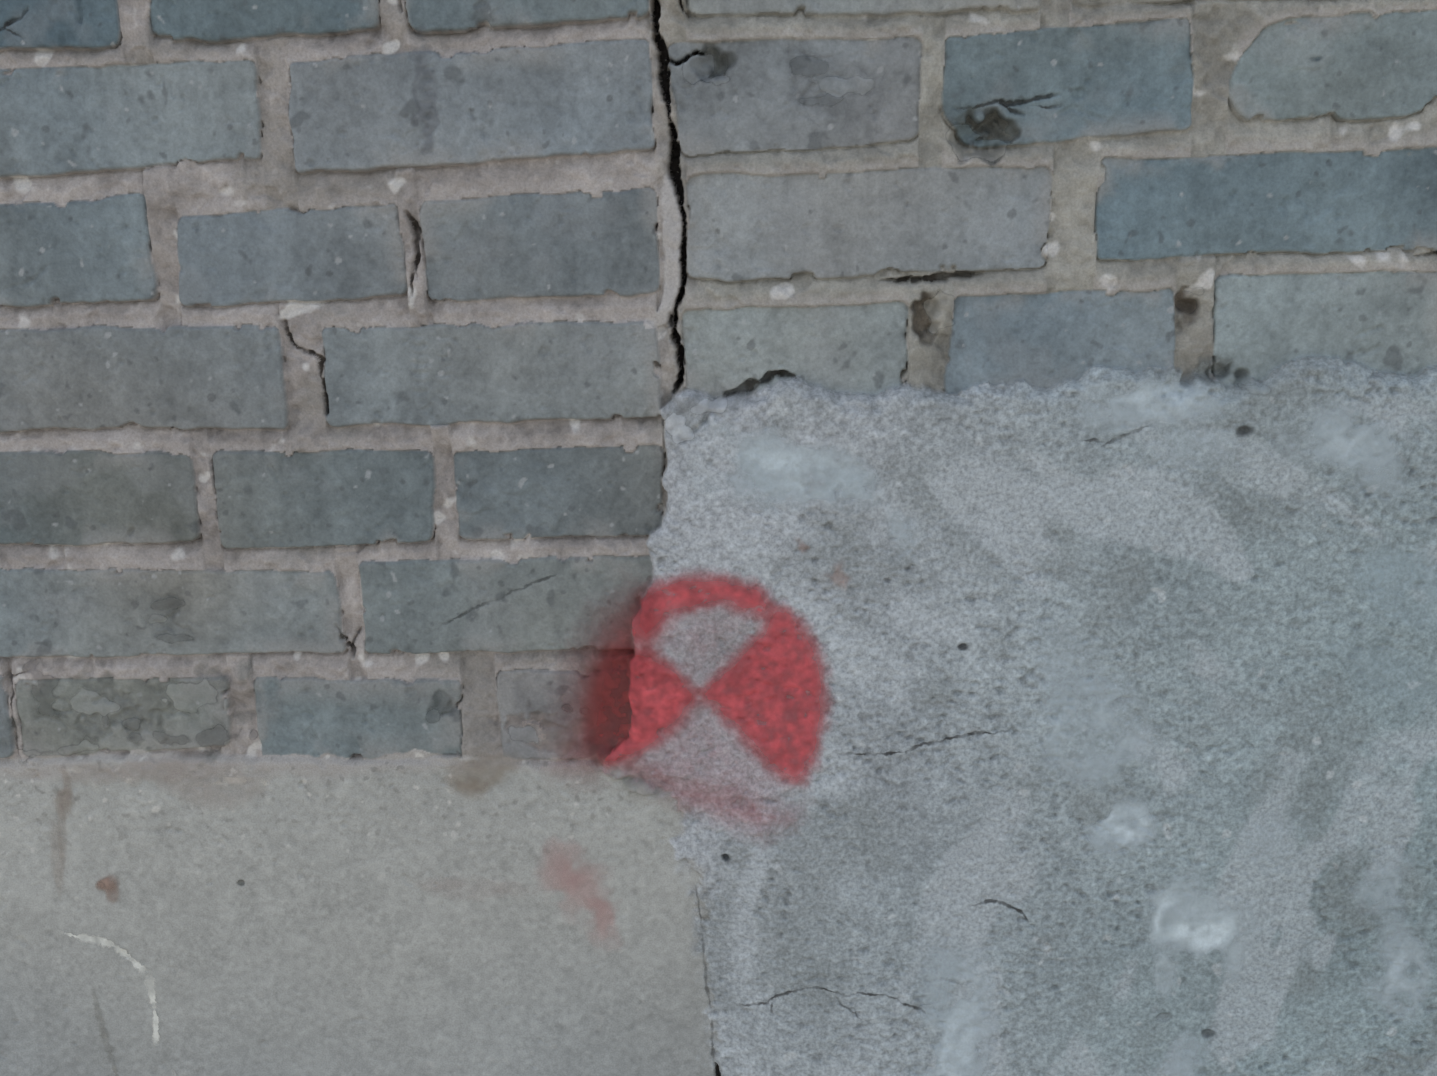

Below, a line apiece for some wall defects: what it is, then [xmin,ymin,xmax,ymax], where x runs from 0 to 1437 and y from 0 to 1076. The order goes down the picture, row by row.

crack [653,0,704,385]
crack [287,332,326,387]
crack [856,732,992,756]
crack [760,988,926,1013]